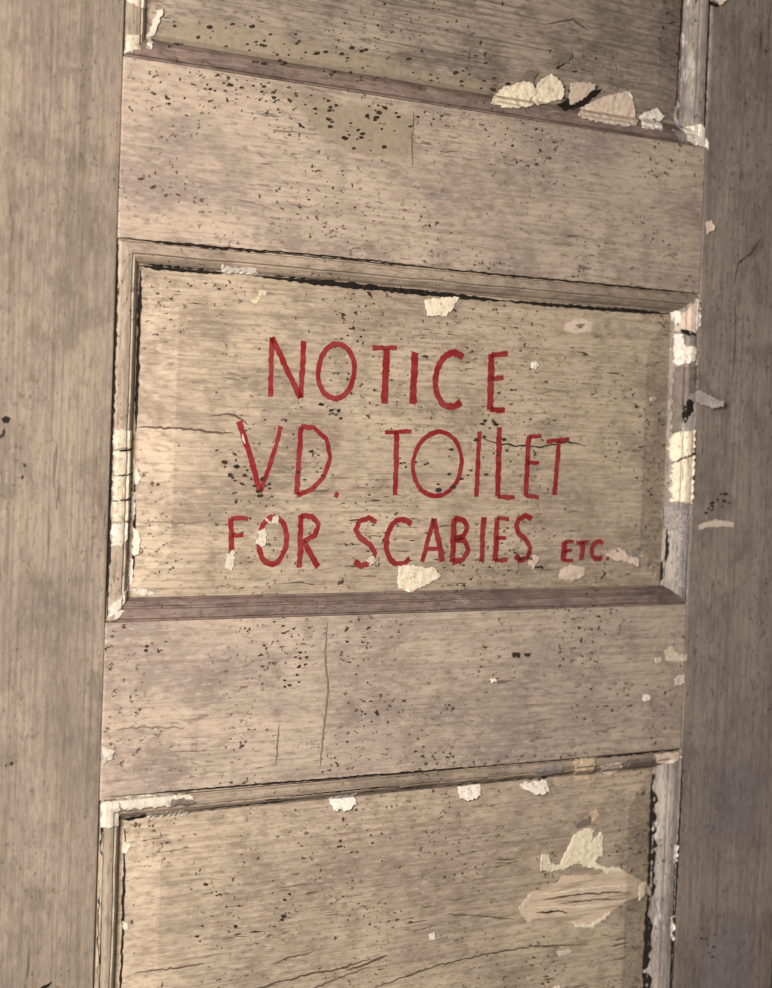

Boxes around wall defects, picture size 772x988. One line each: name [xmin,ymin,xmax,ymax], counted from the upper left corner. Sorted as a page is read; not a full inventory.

peeling [124,0,727,155]
peeling [397,565,441,592]
peeling [328,793,357,811]
peeling [100,793,196,988]
peeling [519,809,646,929]